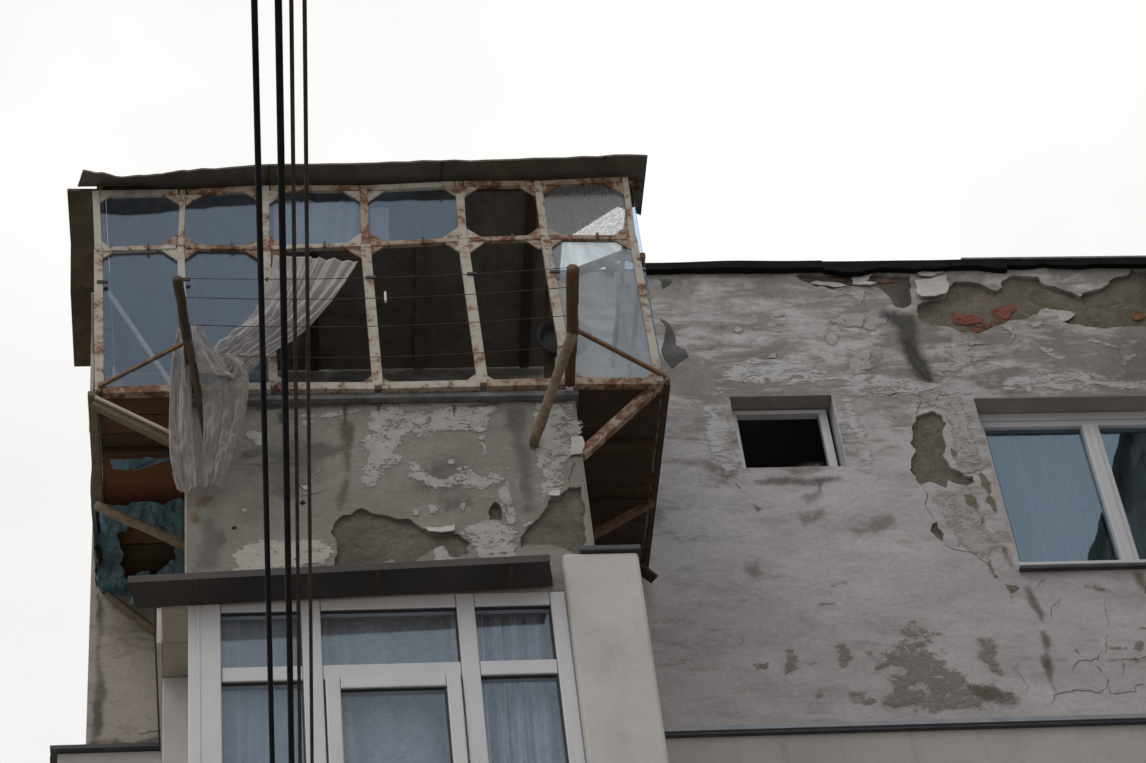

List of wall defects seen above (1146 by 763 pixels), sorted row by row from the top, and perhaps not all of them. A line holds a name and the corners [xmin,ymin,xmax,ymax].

leakage [881,281,930,381]
flaking render [702,271,1146,558]
flaking render [231,403,586,571]
peeling [784,649,816,675]
peeling [835,621,1021,713]
crack [1016,604,1146,706]